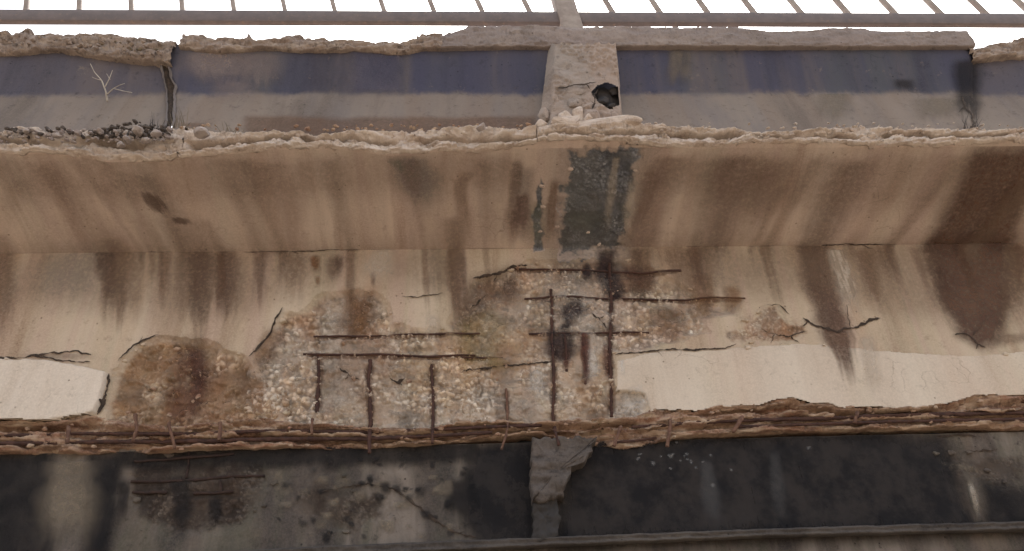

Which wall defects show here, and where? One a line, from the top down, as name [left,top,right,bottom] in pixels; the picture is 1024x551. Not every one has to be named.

crack [160,65,178,127]
crack [0,334,158,415]
crack [247,307,283,357]
corrosion [318,332,474,340]
corrosion [311,354,495,412]
spalling [0,86,1024,458]
corrosion [514,251,738,416]
crack [762,304,882,342]
leakage [801,246,855,368]
leakage [928,150,1024,345]
leakage [47,455,128,551]
spalling [118,462,403,543]